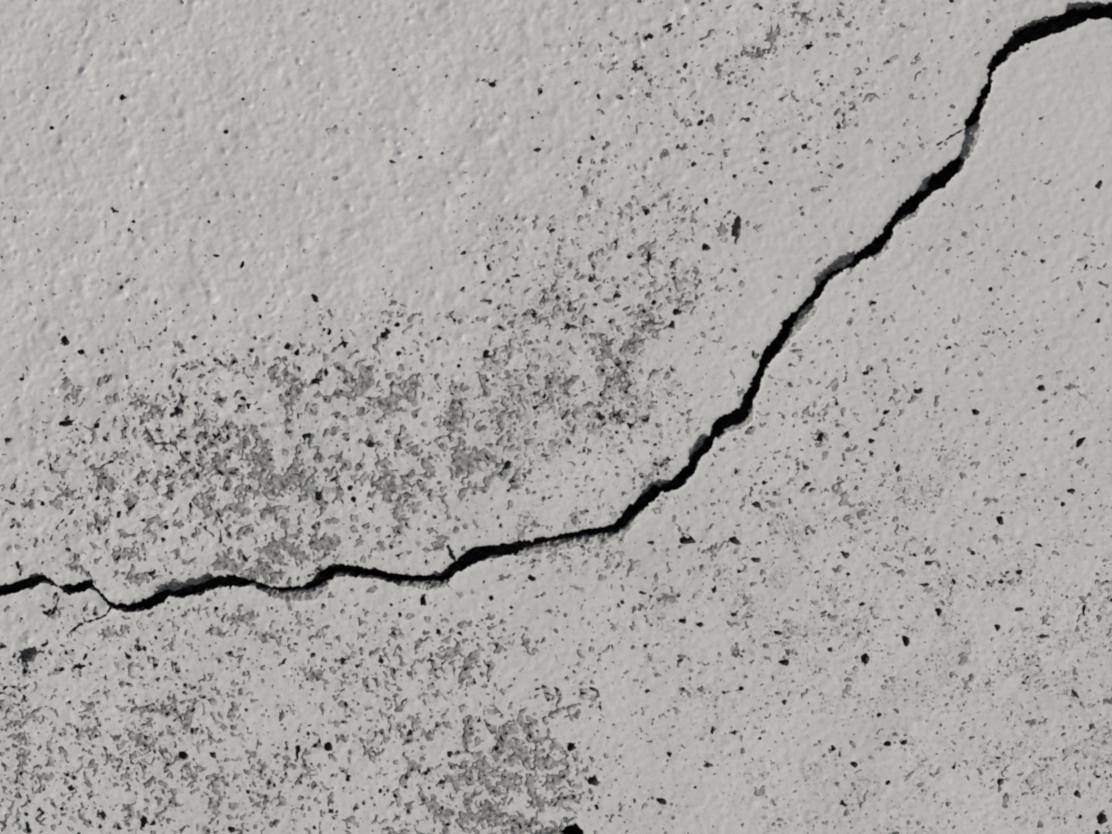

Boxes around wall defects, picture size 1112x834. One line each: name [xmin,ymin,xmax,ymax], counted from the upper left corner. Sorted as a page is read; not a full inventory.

crack [0,1,1112,632]